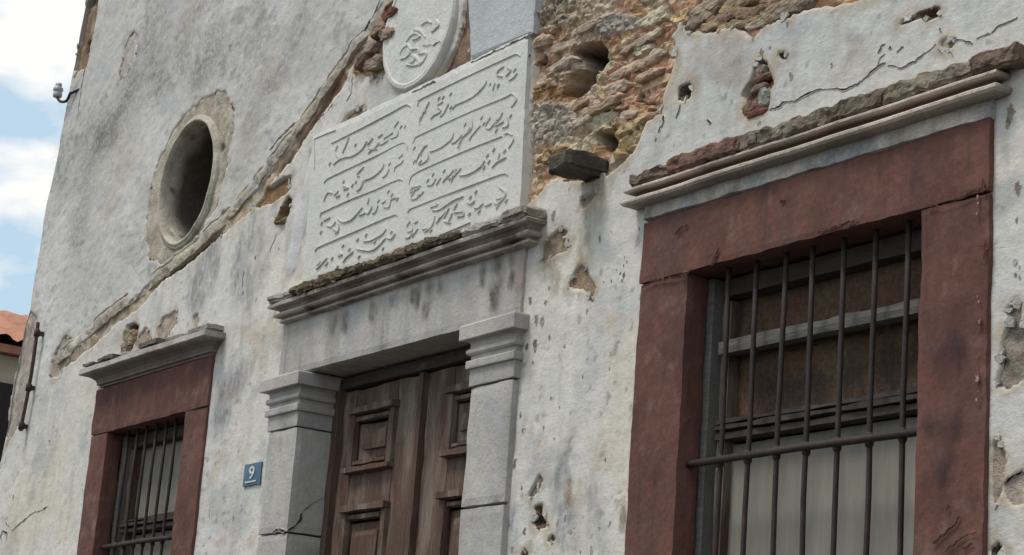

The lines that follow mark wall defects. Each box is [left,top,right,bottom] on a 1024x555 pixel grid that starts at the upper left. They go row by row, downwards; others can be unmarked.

spalling [902,5,942,25]
crack [769,17,1018,110]
spalling [528,0,859,208]
peeling [49,0,398,378]
peeling [538,210,571,265]
peeling [567,256,628,314]
peeling [994,294,1024,389]
peeling [993,435,1024,509]
crack [272,498,322,534]
spalling [510,476,575,555]